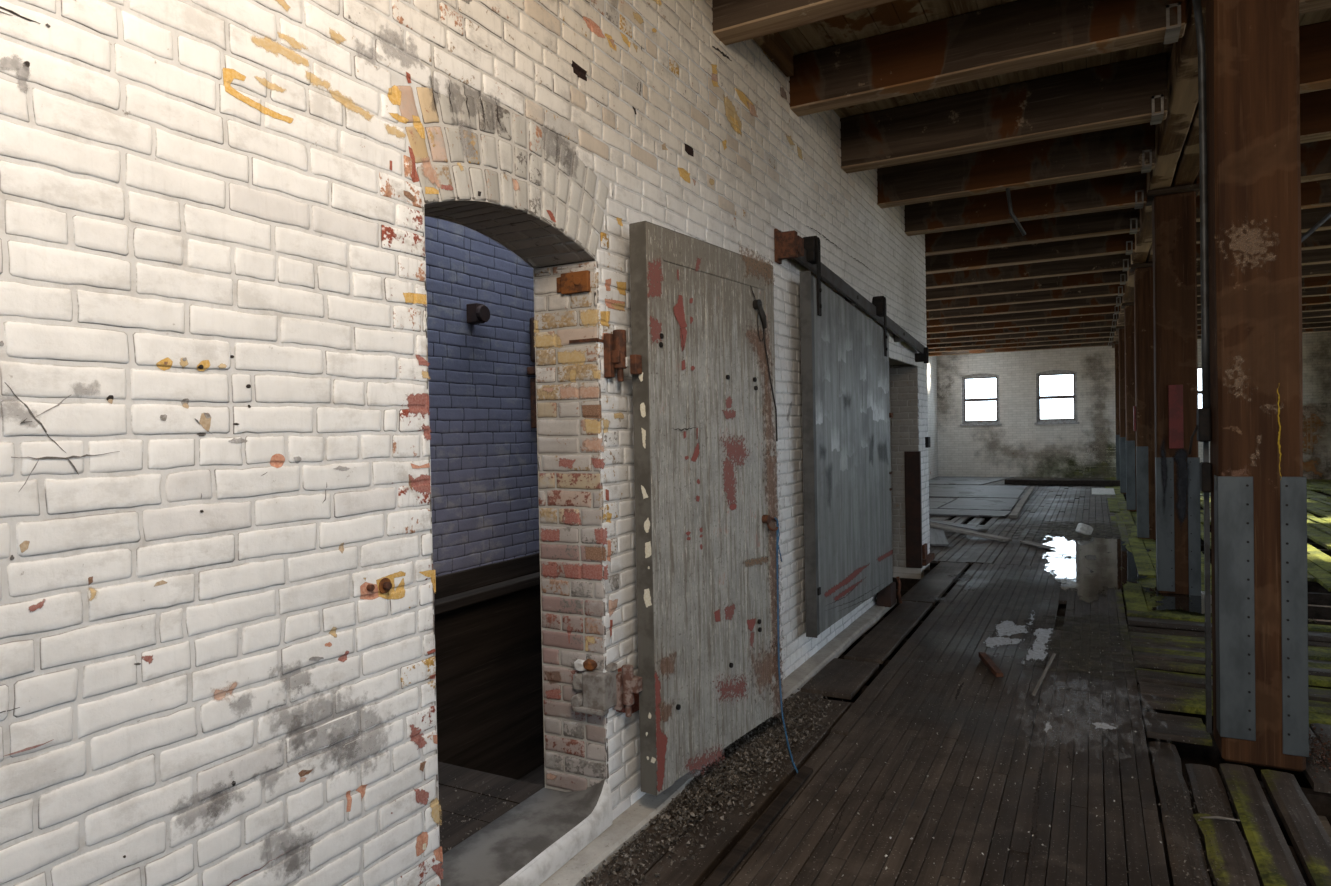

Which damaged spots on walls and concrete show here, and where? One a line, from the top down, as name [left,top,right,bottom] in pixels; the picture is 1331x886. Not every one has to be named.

peeling [330,29,345,43]
peeling [222,68,293,123]
peeling [252,32,373,120]
peeling [386,72,454,202]
peeling [403,292,427,304]
peeling [407,354,431,440]
crack [4,382,120,491]
peeling [408,463,431,494]
spalling [360,570,436,600]
peeling [410,725,437,772]